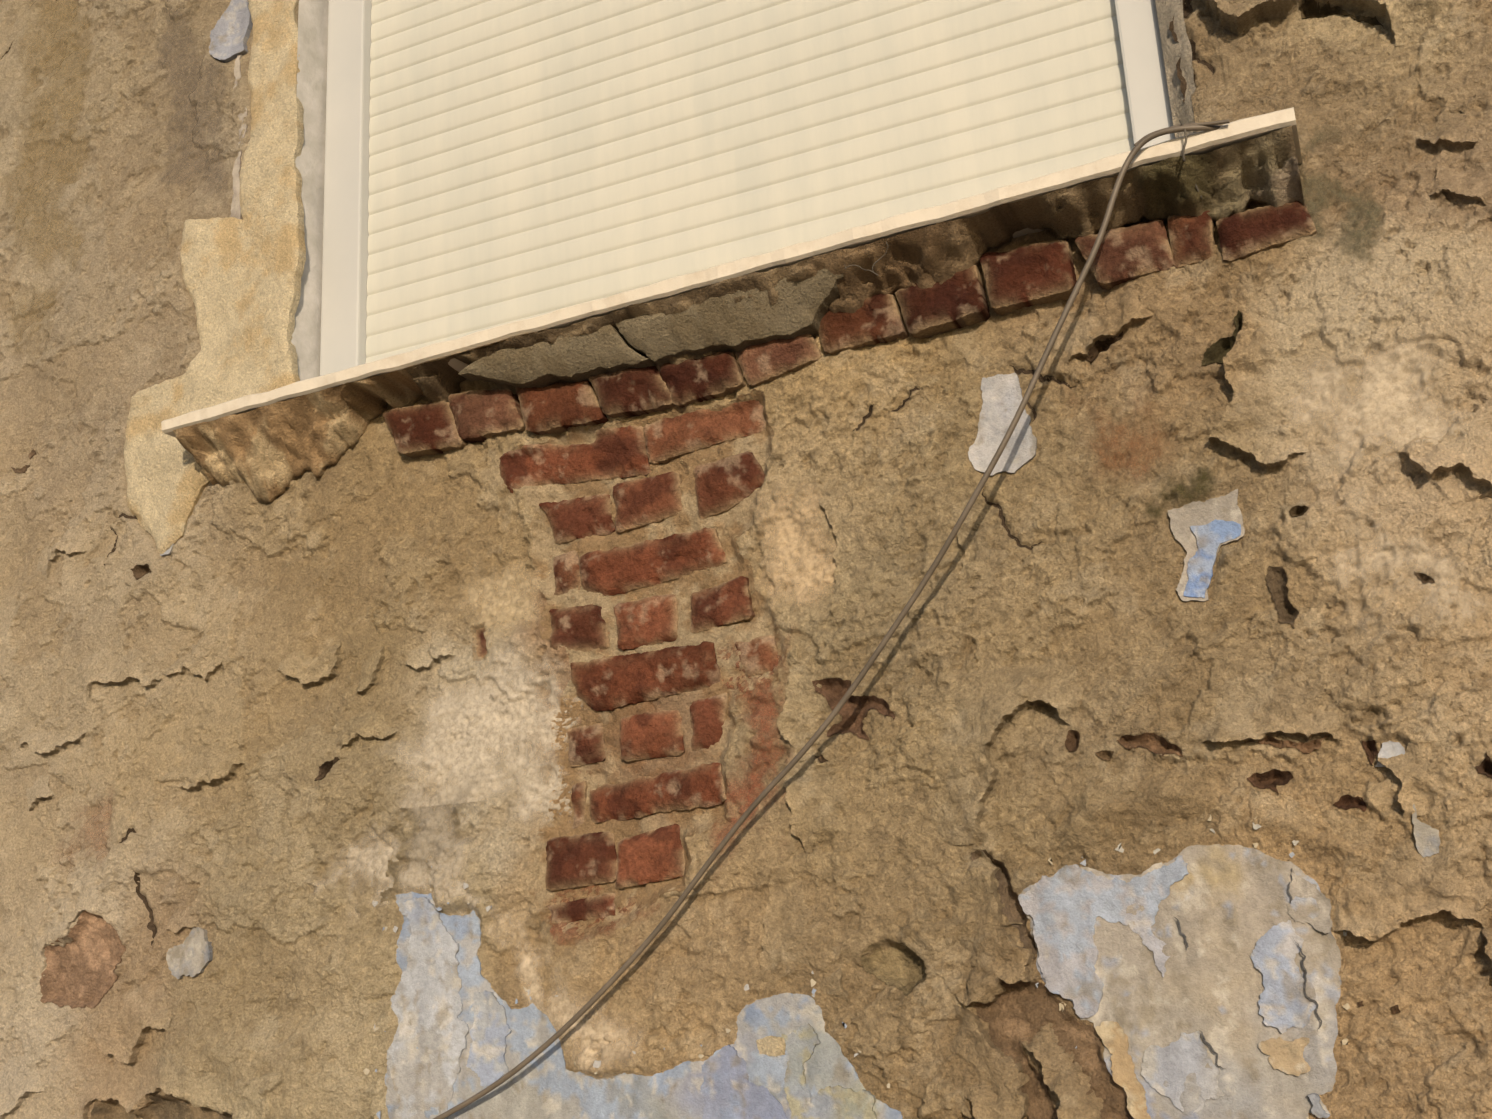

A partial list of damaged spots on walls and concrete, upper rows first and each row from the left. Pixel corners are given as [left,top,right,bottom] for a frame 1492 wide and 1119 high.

crack [1010,365,1076,422]
flaking render [1395,411,1492,489]
crack [982,489,1044,550]
spalling [382,201,1345,940]
spalling [1414,571,1435,584]
flaking render [178,734,247,790]
crack [119,828,157,946]
peeling [363,650,1492,1119]
spalling [32,886,271,1119]
flaking render [0,1052,46,1119]